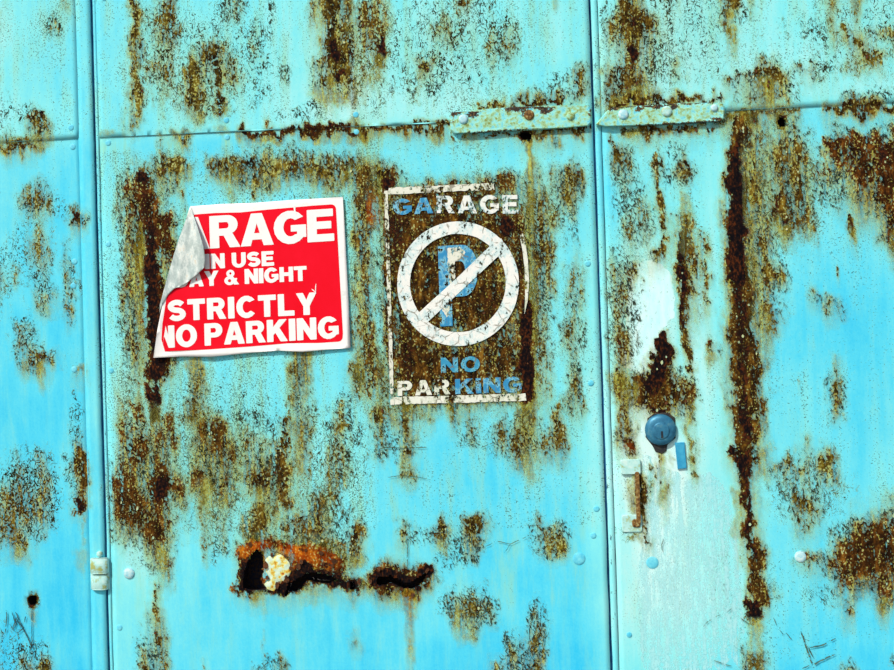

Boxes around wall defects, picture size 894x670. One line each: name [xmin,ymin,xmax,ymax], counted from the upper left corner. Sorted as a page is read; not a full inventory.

rust [44,11,63,41]
rust [0,96,55,160]
rust [0,177,90,379]
rust [100,0,521,670]
rust [444,156,589,475]
rust [476,0,894,632]
rust [0,389,91,563]
rust [1,631,52,670]
spalling [237,542,429,598]
rust [735,642,770,670]